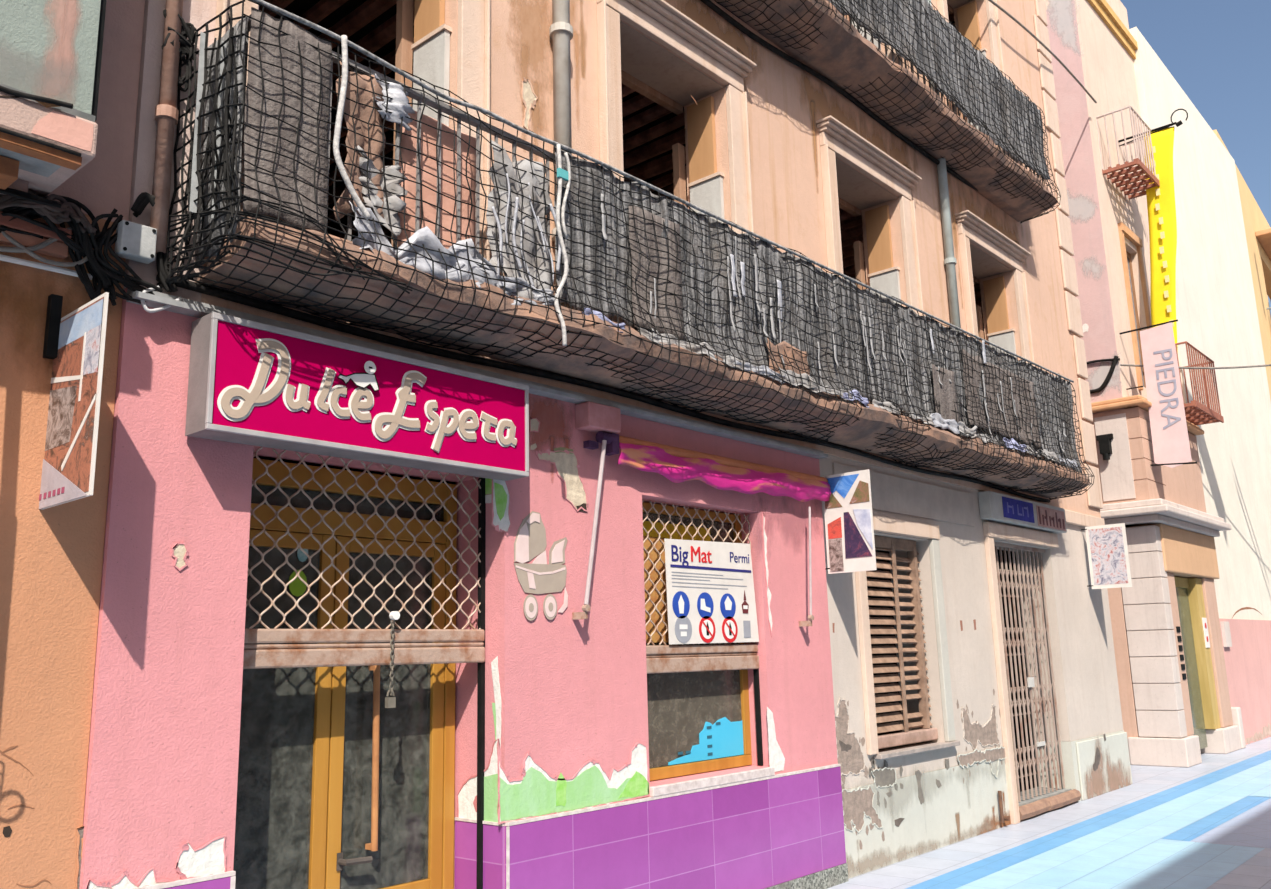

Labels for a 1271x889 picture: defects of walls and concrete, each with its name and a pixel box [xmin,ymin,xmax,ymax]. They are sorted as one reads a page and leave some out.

peeling [529,418,588,512]
peeling [171,543,189,571]
peeling [762,512,773,637]
crack [0,745,33,775]
peeling [457,656,649,824]
peeling [767,707,785,772]
peeling [834,689,1006,849]
peeling [75,826,226,889]